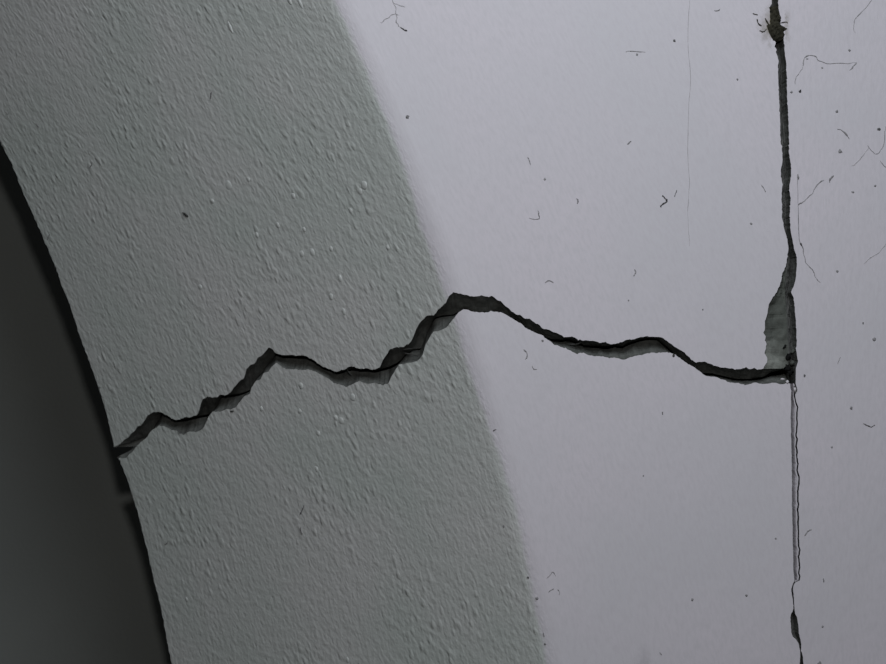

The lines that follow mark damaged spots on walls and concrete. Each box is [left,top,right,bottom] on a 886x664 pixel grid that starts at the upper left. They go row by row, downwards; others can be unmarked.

crack [115,0,818,664]